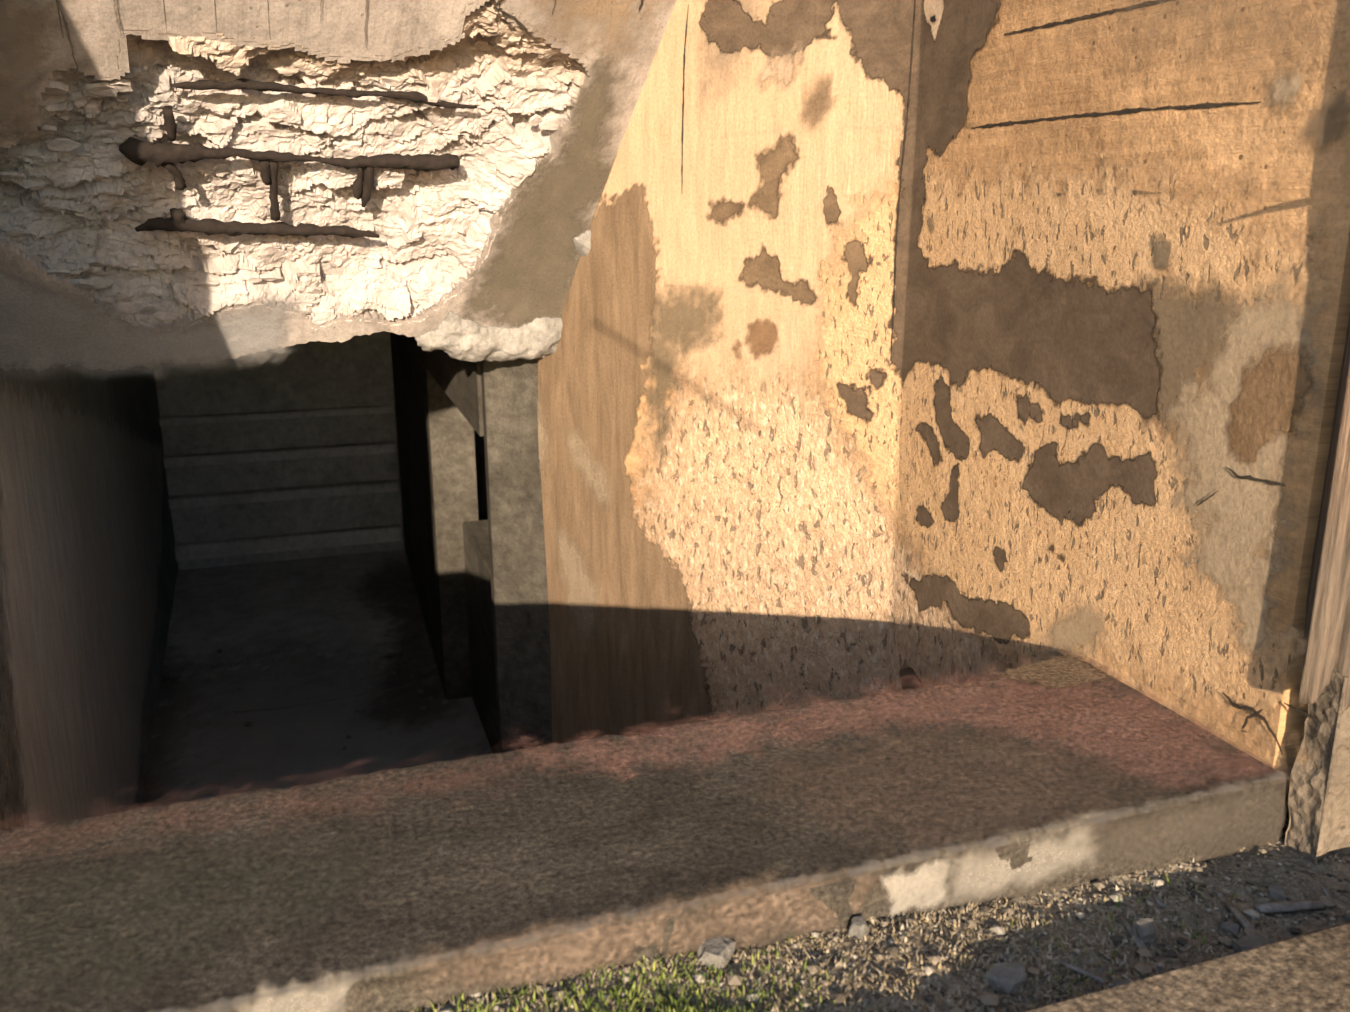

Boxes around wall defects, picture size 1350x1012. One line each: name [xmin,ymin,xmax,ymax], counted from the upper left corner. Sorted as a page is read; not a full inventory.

crack [56,0,78,70]
crack [113,0,122,35]
crack [362,0,370,46]
crack [493,0,556,36]
rust [170,78,477,109]
rust [119,106,460,238]
spalling [0,0,596,331]
flaking render [699,0,1325,745]